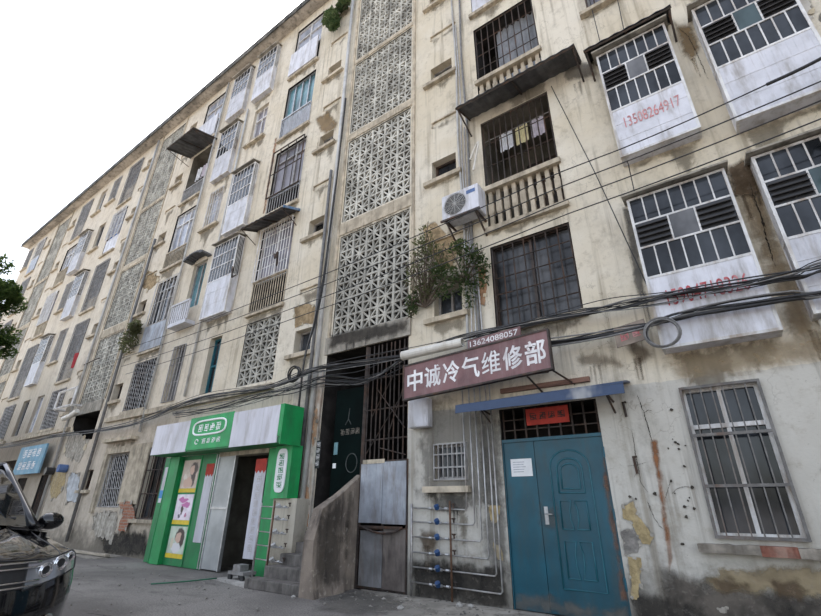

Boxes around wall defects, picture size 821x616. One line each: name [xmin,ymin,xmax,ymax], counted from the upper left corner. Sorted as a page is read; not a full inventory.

crack [750,184,776,266]
peeling [49,427,90,505]
peeling [92,500,136,545]
peeling [620,495,654,600]
rust [652,440,668,540]
water stain [634,567,821,616]